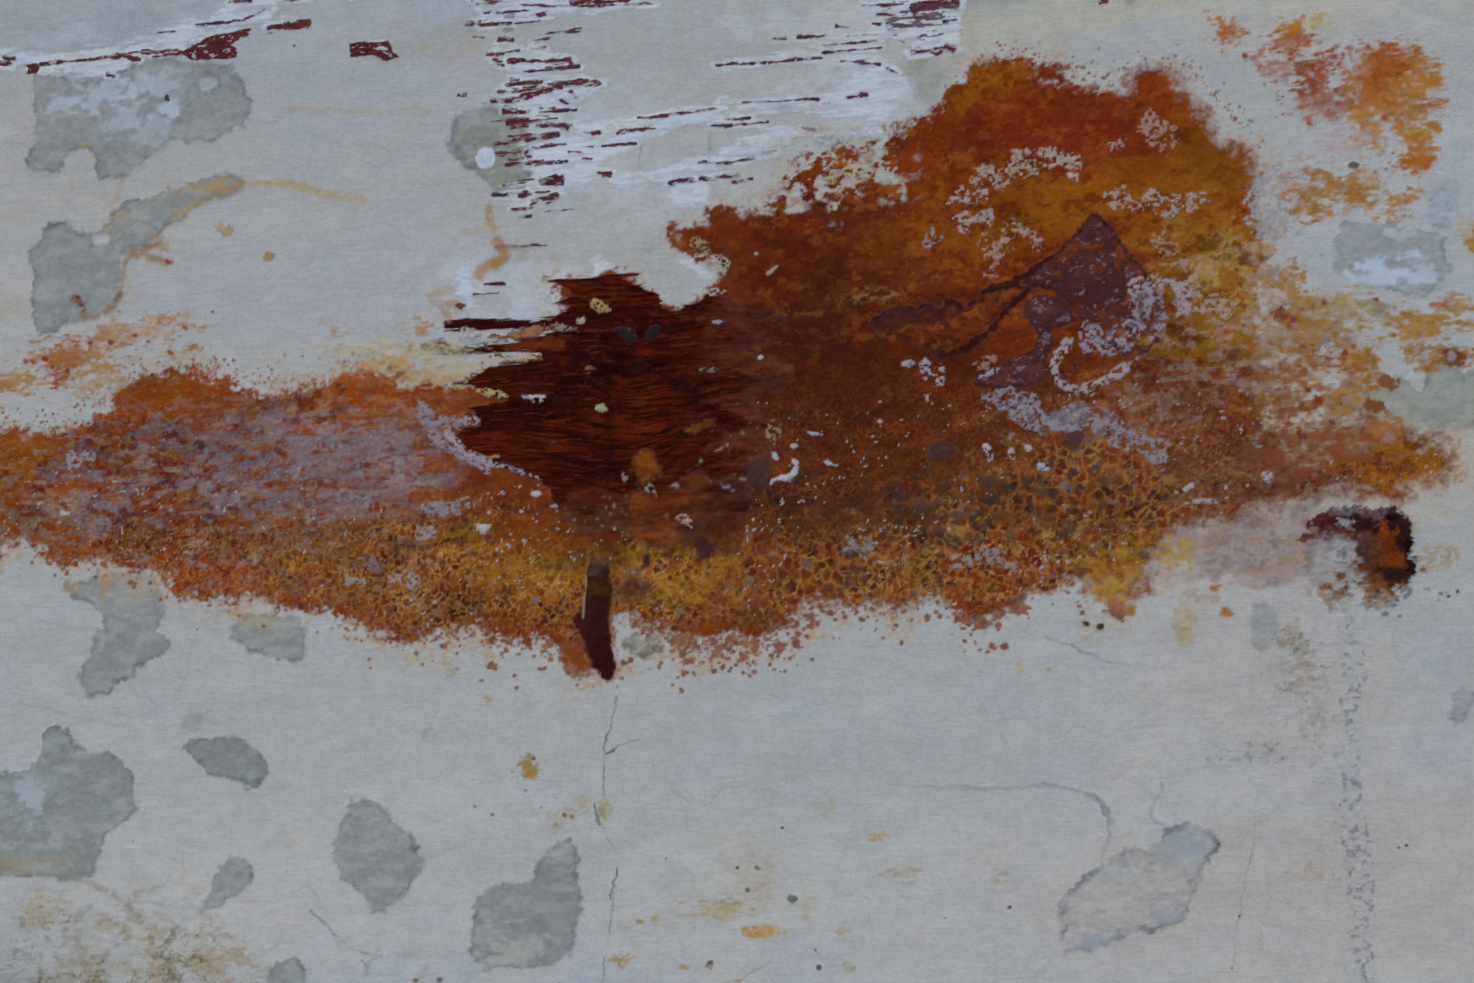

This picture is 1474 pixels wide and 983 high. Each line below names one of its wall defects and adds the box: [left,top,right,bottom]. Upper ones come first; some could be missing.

peeling [0,0,362,339]
peeling [347,37,400,62]
peeling [442,0,969,221]
peeling [450,263,507,317]
peeling [681,258,711,281]
rust [0,4,1474,704]
peeling [58,579,173,703]
peeling [0,723,140,882]
peeling [175,703,273,793]
peeling [328,795,431,914]
peeling [466,836,587,983]
peeling [1051,816,1226,959]